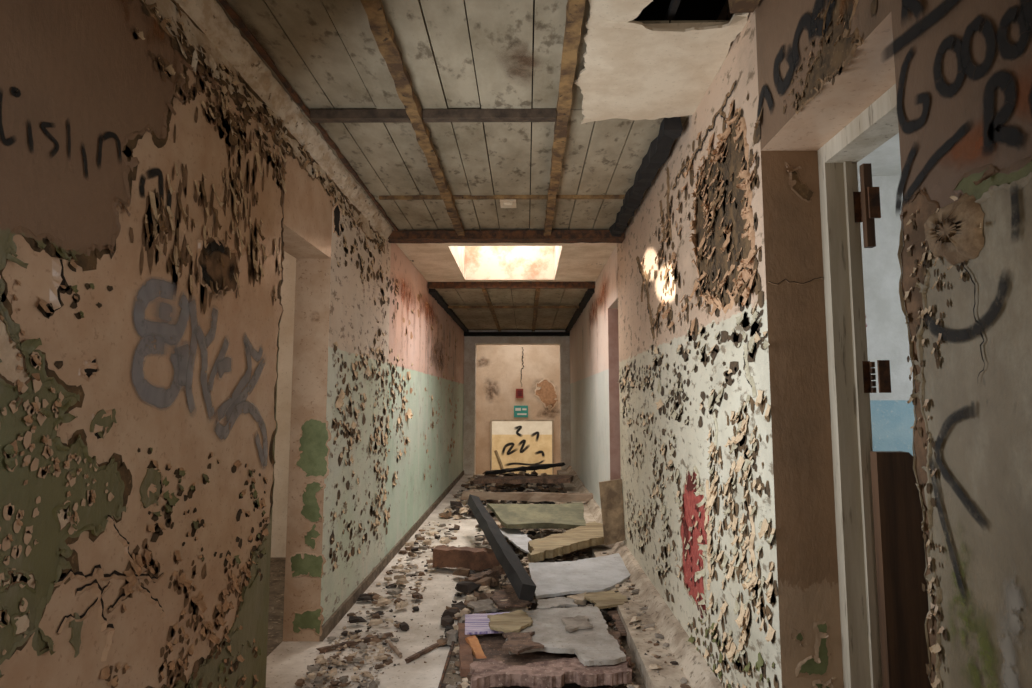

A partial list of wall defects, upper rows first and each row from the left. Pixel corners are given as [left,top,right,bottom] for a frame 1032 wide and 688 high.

peeling [0,0,459,688]
peeling [617,94,779,688]